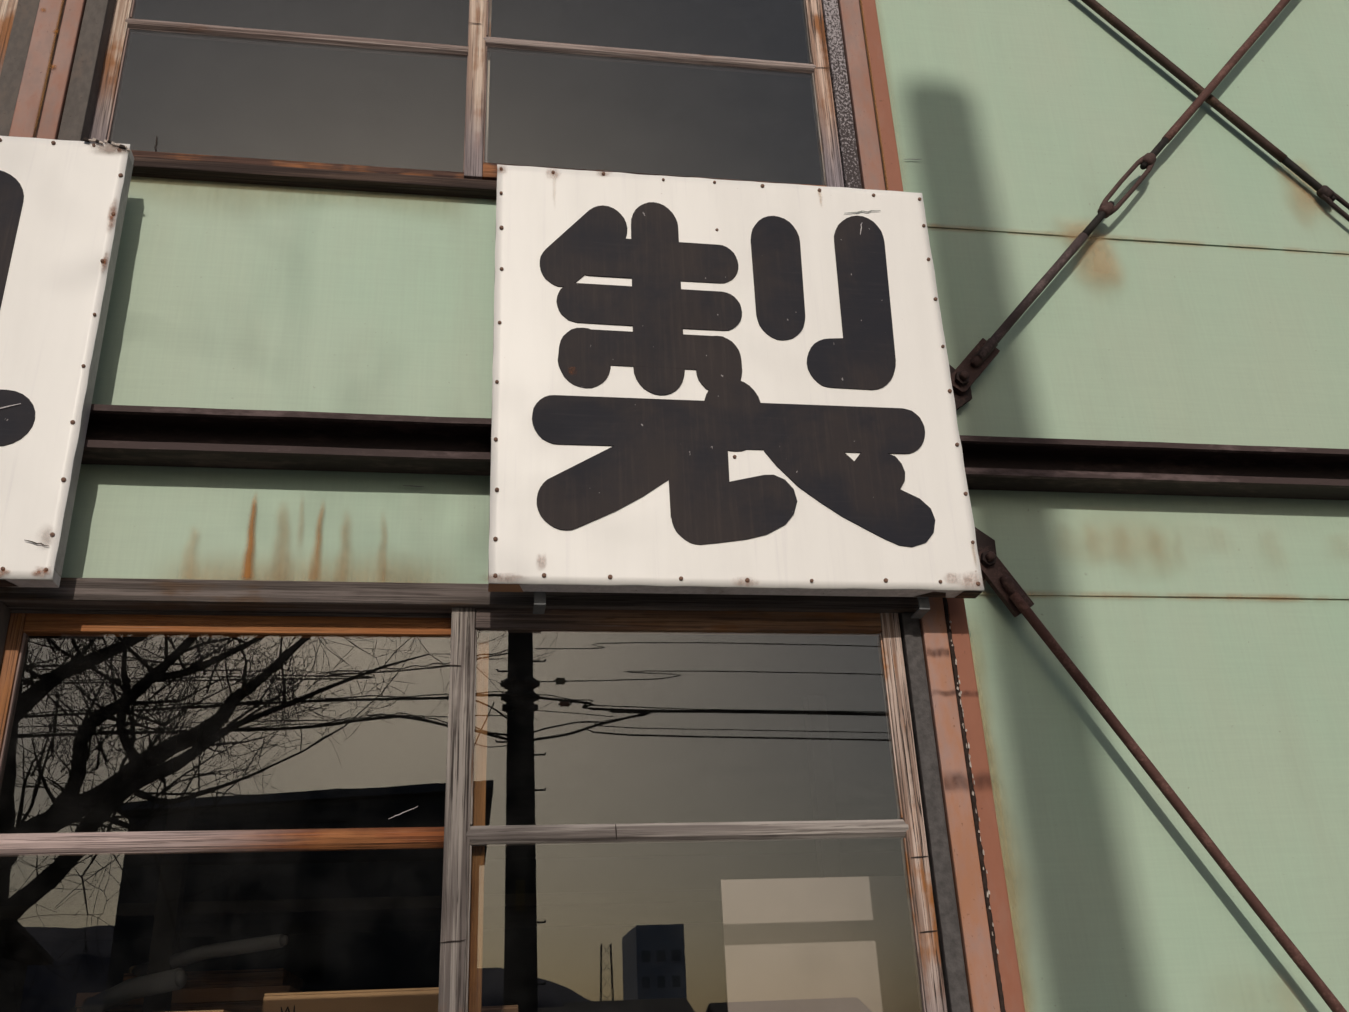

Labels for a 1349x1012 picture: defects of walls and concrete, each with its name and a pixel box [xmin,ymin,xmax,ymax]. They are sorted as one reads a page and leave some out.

rust [243,501,255,578]